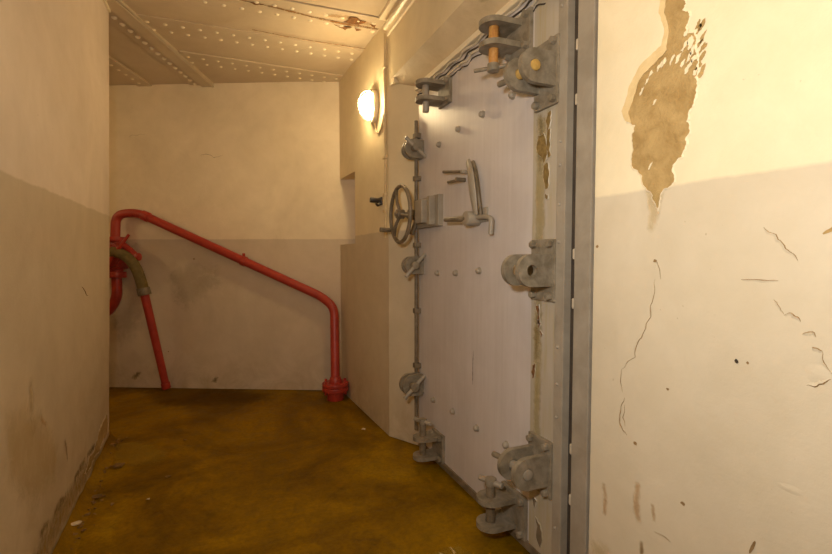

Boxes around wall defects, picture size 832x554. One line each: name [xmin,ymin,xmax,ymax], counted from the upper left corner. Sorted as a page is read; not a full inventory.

peeling [622,0,708,212]
crack [618,261,661,435]
crack [741,279,832,387]